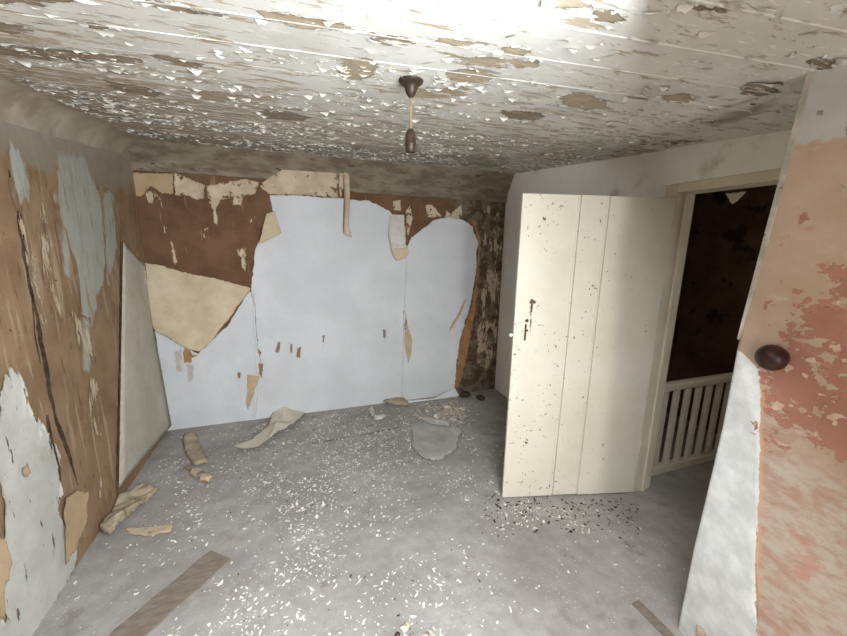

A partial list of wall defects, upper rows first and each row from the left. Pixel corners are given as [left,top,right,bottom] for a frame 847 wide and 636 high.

peeling [0,0,743,173]
peeling [735,57,797,126]
peeling [806,54,847,71]
peeling [455,219,481,389]
peeling [750,262,847,463]